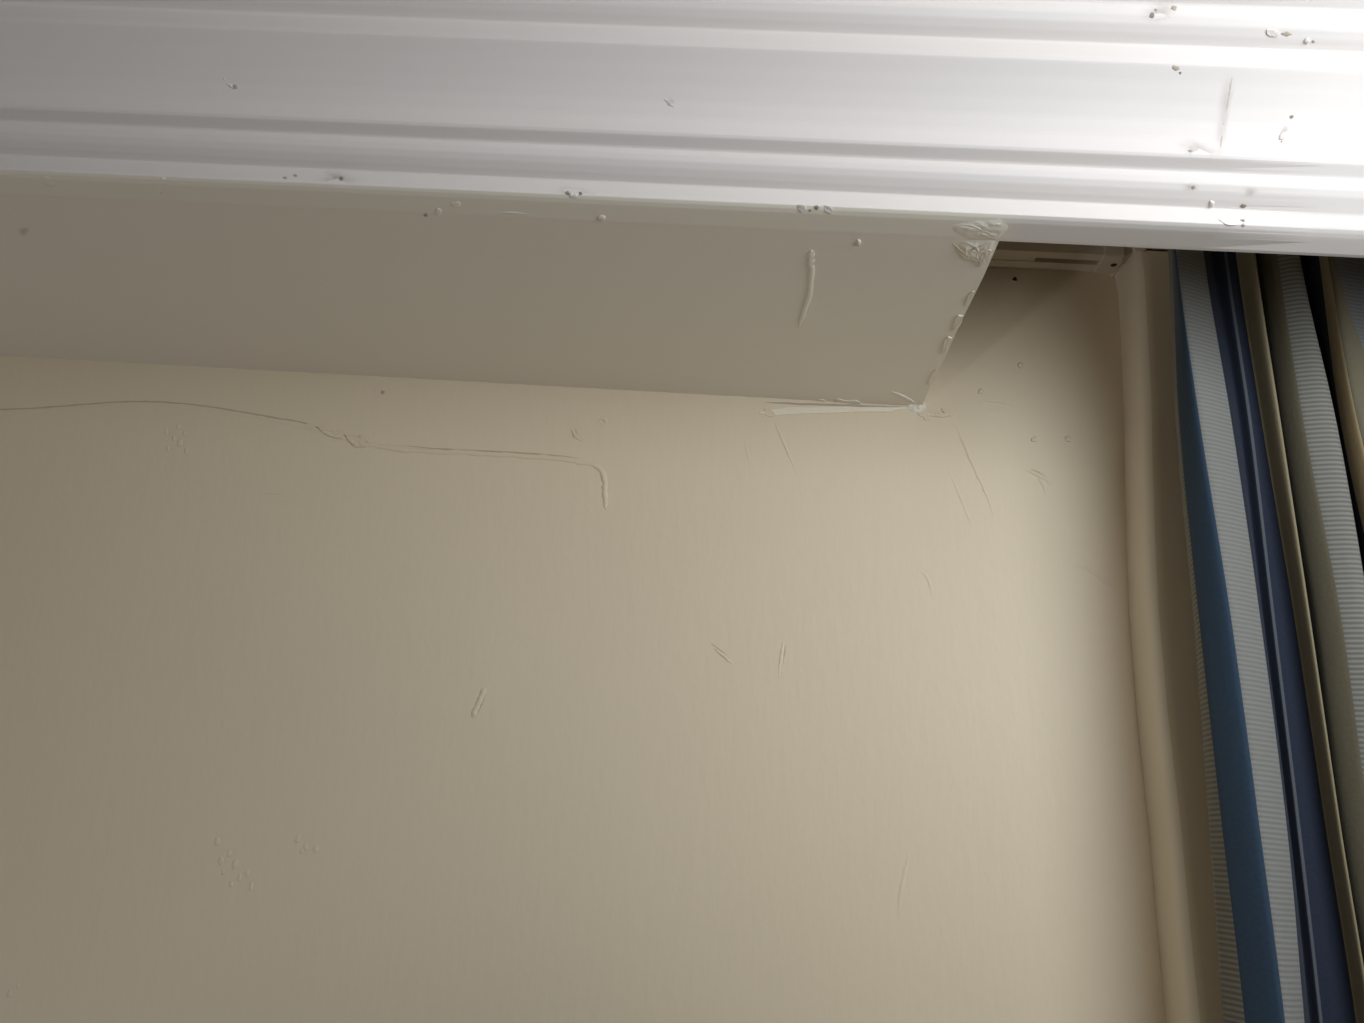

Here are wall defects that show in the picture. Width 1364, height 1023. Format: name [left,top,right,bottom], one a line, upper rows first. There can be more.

crack [0,401,608,510]